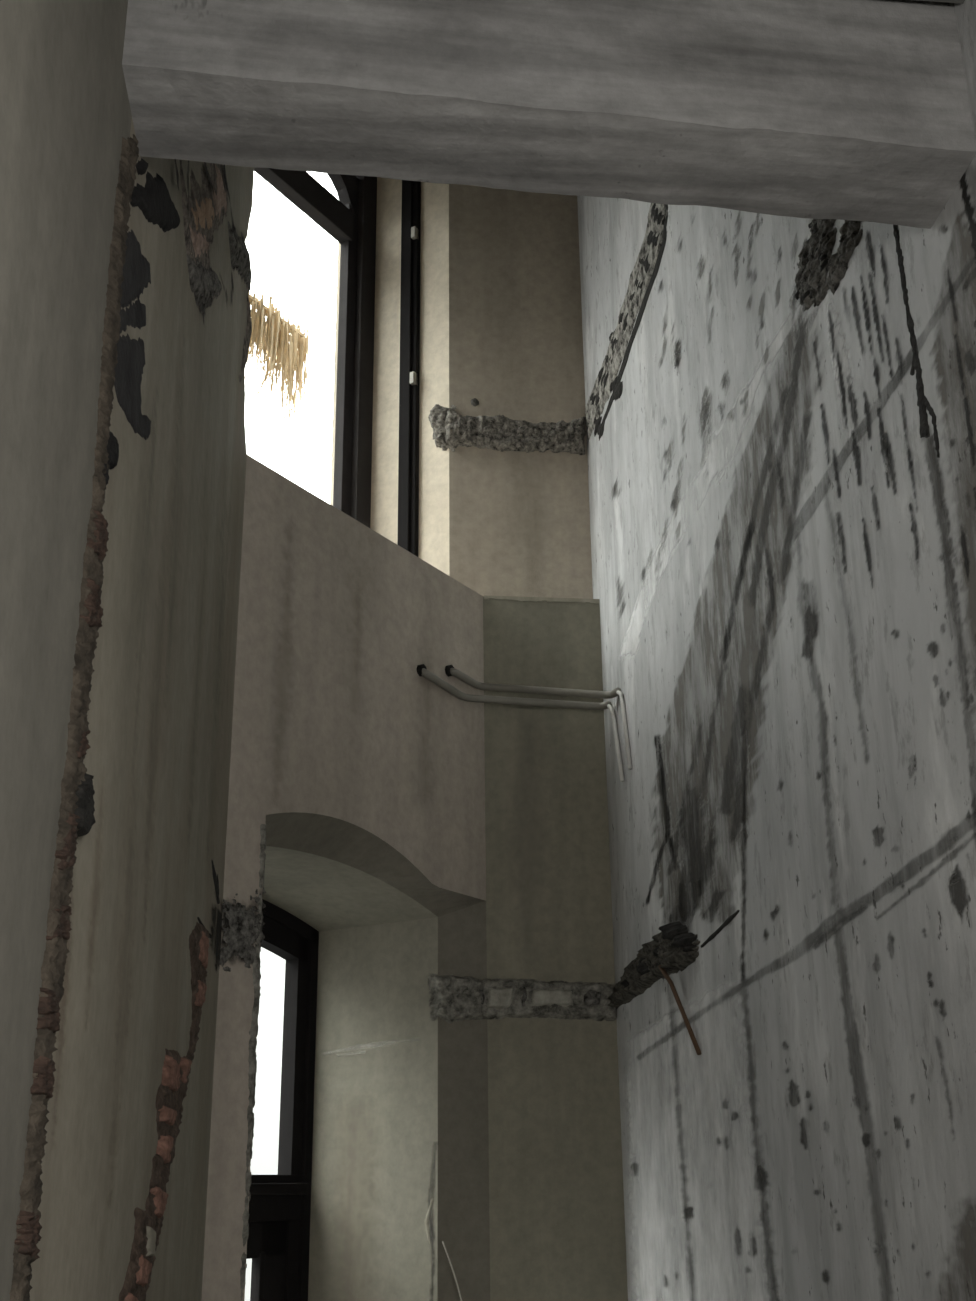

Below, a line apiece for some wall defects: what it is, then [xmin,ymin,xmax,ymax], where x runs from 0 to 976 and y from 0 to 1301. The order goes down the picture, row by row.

spalling [428,203,682,455]
spalling [795,219,863,311]
flaking render [9,134,266,1301]
spalling [428,921,701,1055]